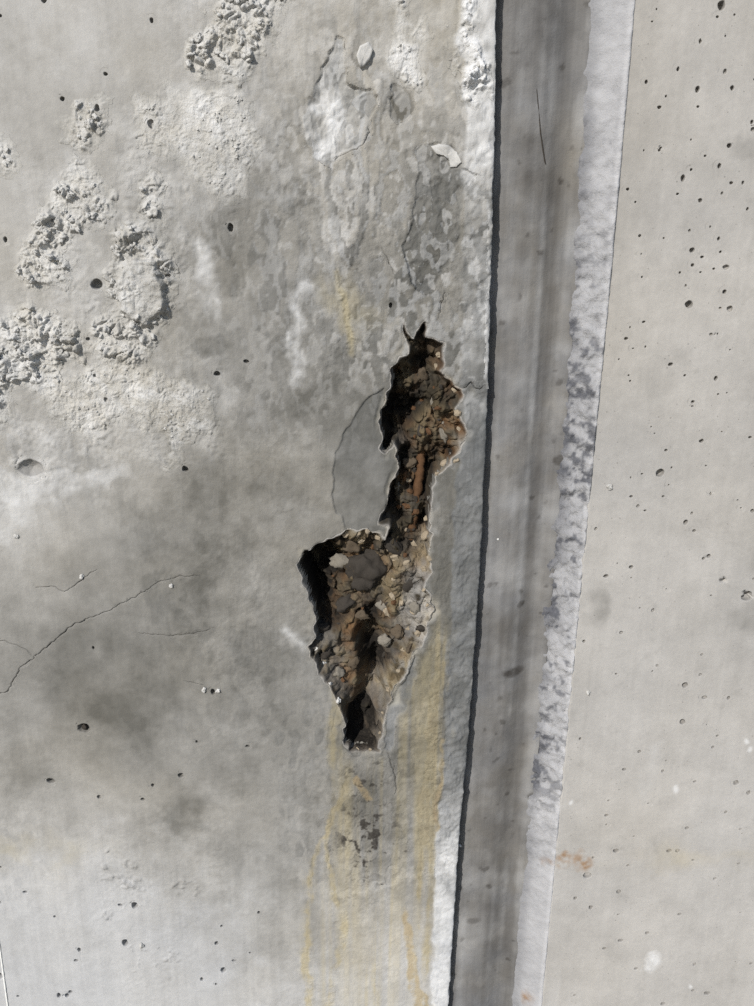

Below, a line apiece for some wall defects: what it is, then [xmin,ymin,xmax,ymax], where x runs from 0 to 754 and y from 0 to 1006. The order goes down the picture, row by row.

flaking render [301,35,418,170]
spalling [442,0,491,77]
spalling [0,0,292,473]
flaking render [400,141,479,295]
crack [35,567,99,595]
crack [0,572,203,698]
crack [138,626,216,639]
spalling [296,320,467,753]
rust [294,608,460,1006]
rust [536,847,595,873]